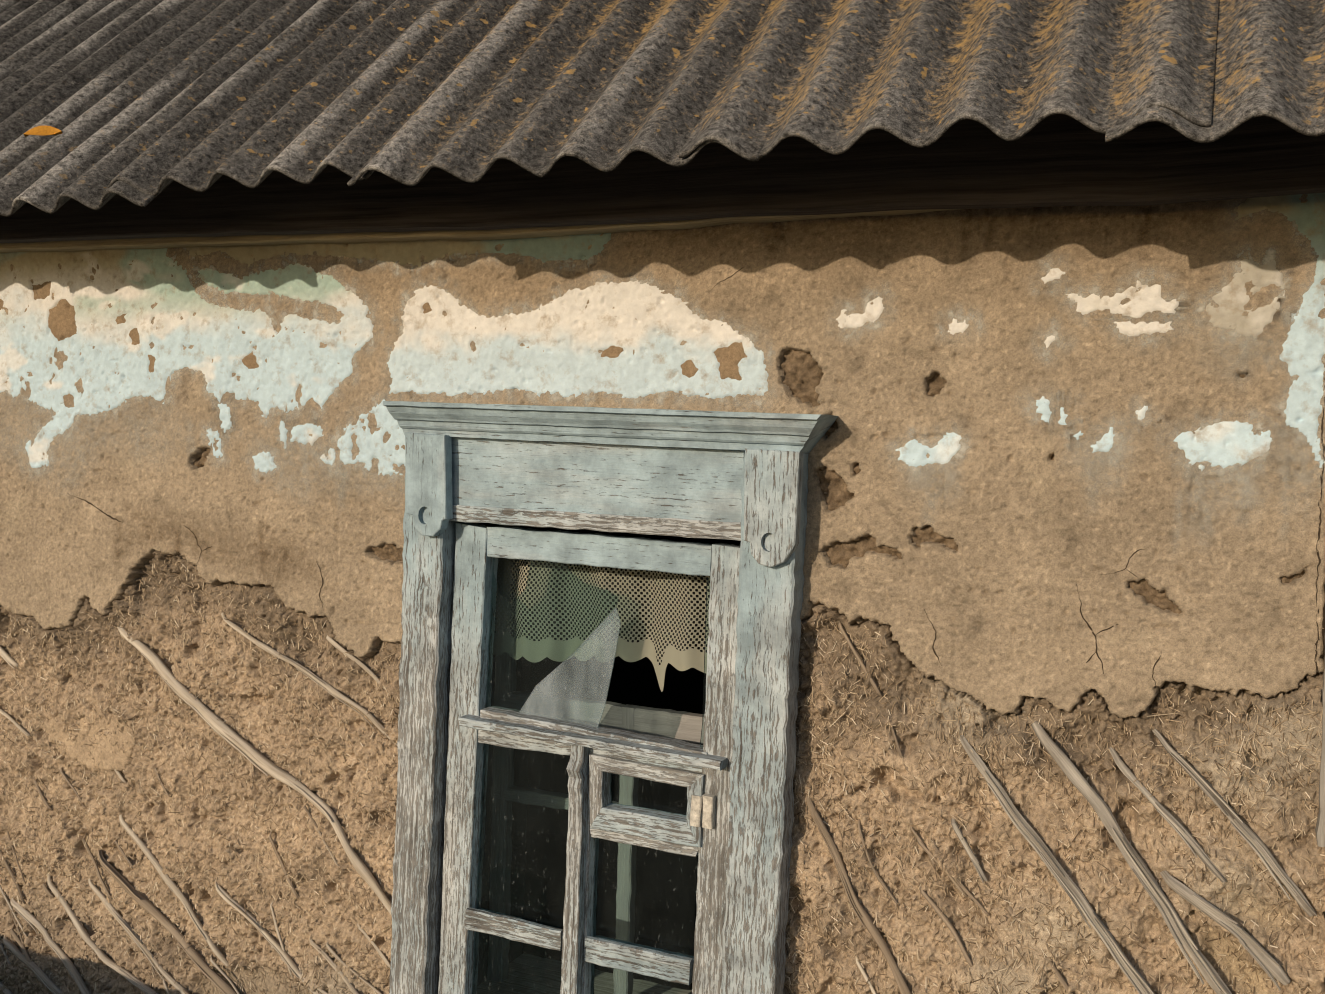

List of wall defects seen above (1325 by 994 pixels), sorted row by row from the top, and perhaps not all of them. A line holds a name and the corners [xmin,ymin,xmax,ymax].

peeling [0,233,824,481]
peeling [1026,396,1124,460]
crack [1076,549,1143,674]
spalling [1129,579,1181,614]
peeling [1041,193,1325,481]
crack [1314,378,1325,672]
spalling [0,551,401,994]
spalling [783,603,1325,994]